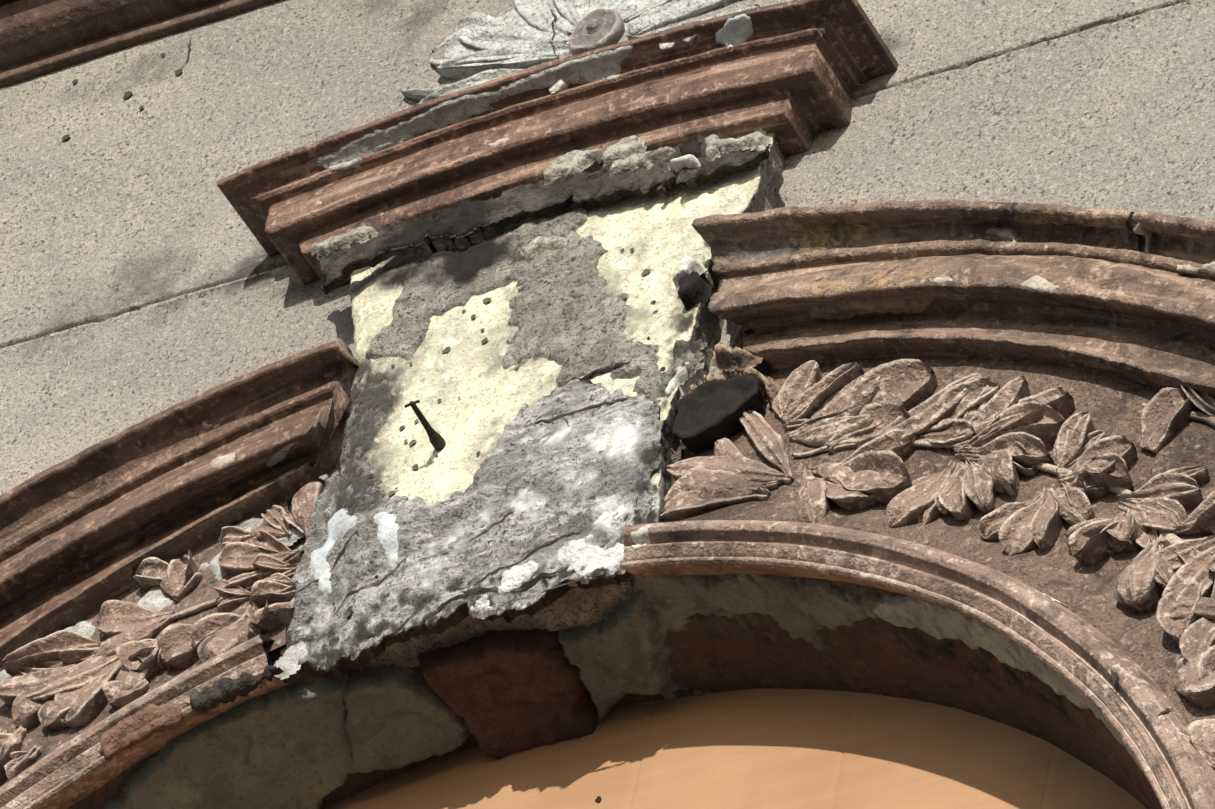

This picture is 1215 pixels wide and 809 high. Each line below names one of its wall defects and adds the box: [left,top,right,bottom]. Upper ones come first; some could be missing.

crack [541,0,557,54]
peeling [659,34,697,50]
peeling [315,45,634,171]
spalling [311,129,772,295]
damp [662,303,701,408]
peeling [184,513,304,581]
peeling [309,508,357,596]
peeling [373,512,399,567]
damp [616,443,661,544]
peeling [64,621,104,637]
damp [280,563,611,669]
flaking render [97,524,1142,809]